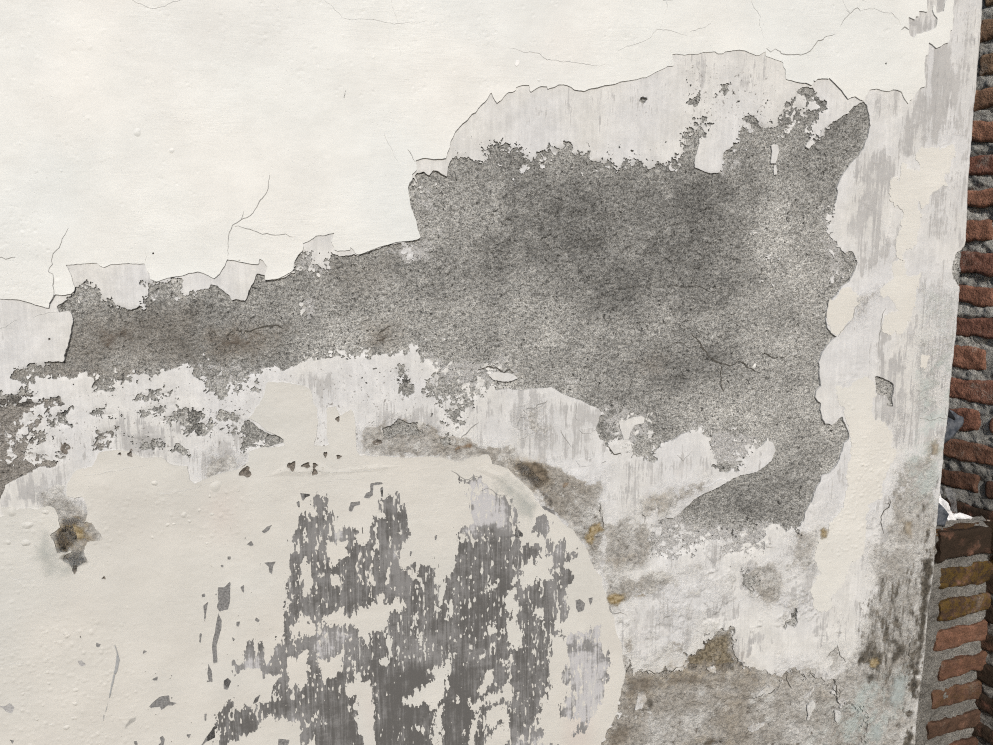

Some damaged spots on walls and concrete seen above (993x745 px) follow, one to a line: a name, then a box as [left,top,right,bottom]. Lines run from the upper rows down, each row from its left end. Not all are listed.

crack [751,0,909,55]
crack [227,175,291,264]
crack [668,335,786,391]
spalling [287,461,318,475]
peeling [349,482,383,512]
peeling [294,558,313,597]
peeling [326,533,370,586]
flaking render [742,570,755,592]
peeling [199,582,244,690]
peeling [286,593,423,745]
peeling [403,583,592,745]
peeling [150,695,176,710]